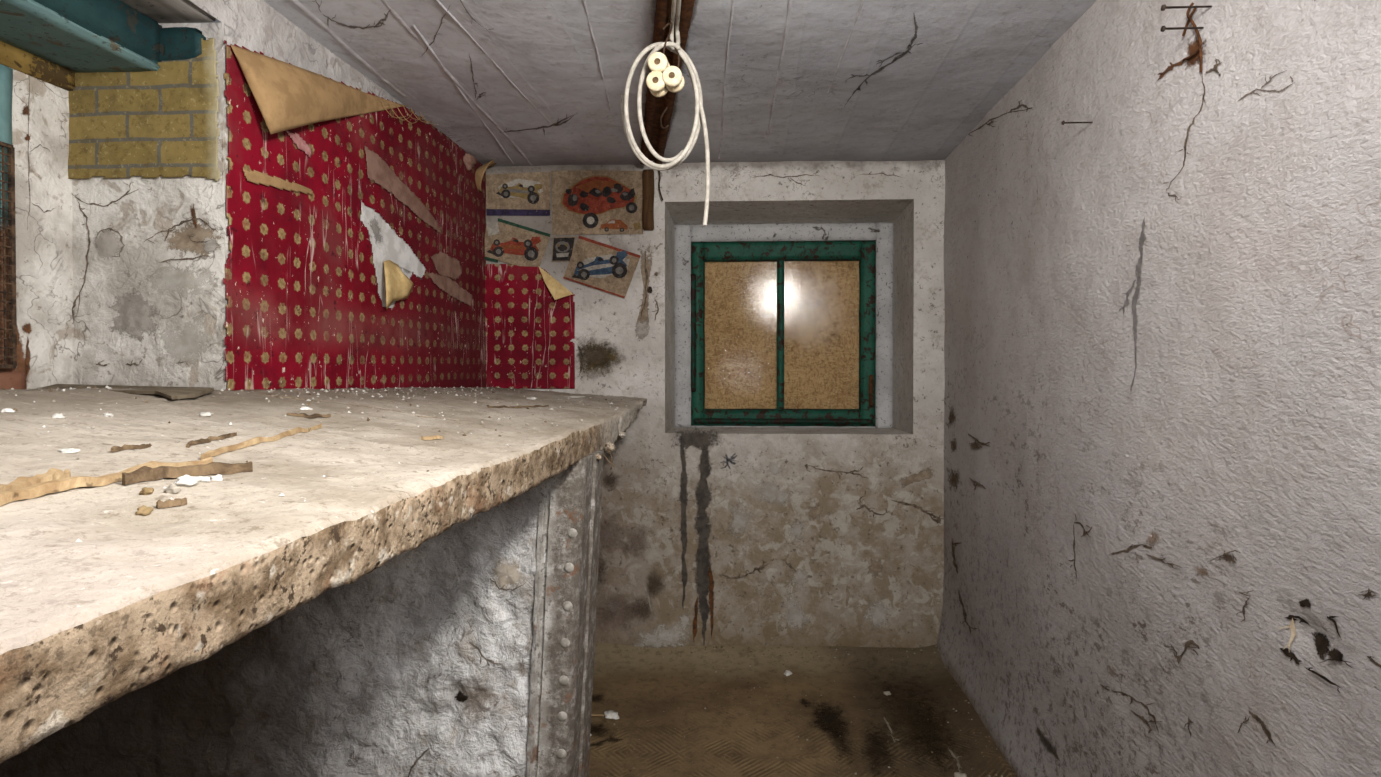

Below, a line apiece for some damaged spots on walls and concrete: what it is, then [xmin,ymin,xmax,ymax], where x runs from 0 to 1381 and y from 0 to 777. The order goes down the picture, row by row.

peeling [231,45,407,134]
crack [844,15,922,107]
rust [1157,37,1206,81]
crack [27,79,138,324]
peeling [106,204,221,366]
flaking render [360,200,426,310]
crack [1119,58,1293,390]
damp [578,339,622,374]
damp [675,428,718,645]
damp [801,686,962,773]